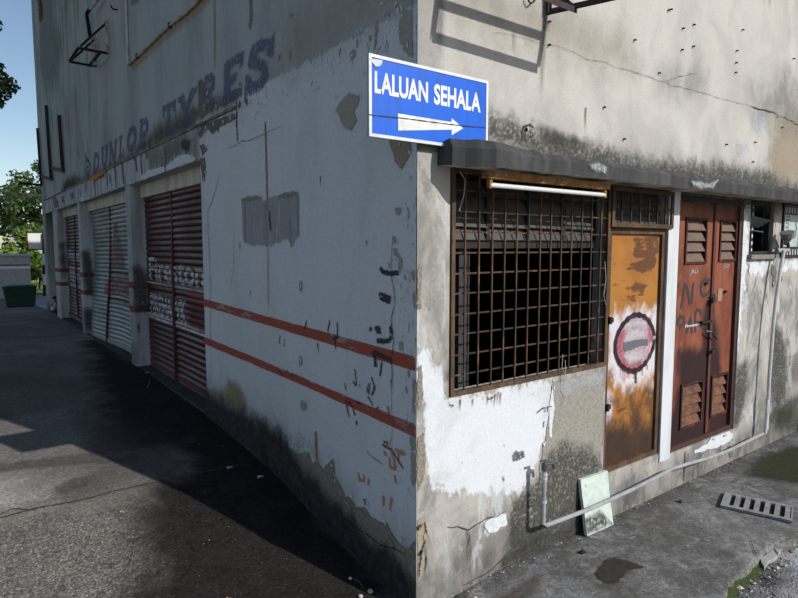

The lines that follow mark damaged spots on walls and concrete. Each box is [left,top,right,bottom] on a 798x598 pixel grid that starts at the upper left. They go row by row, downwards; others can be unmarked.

leakage [107,96,237,186]
peeling [334,93,359,130]
peeling [389,140,411,169]
leakage [488,116,798,211]
leakage [734,362,758,427]
leakage [769,317,798,432]
peeling [536,371,603,522]
peeling [286,433,429,598]
crack [449,511,505,547]